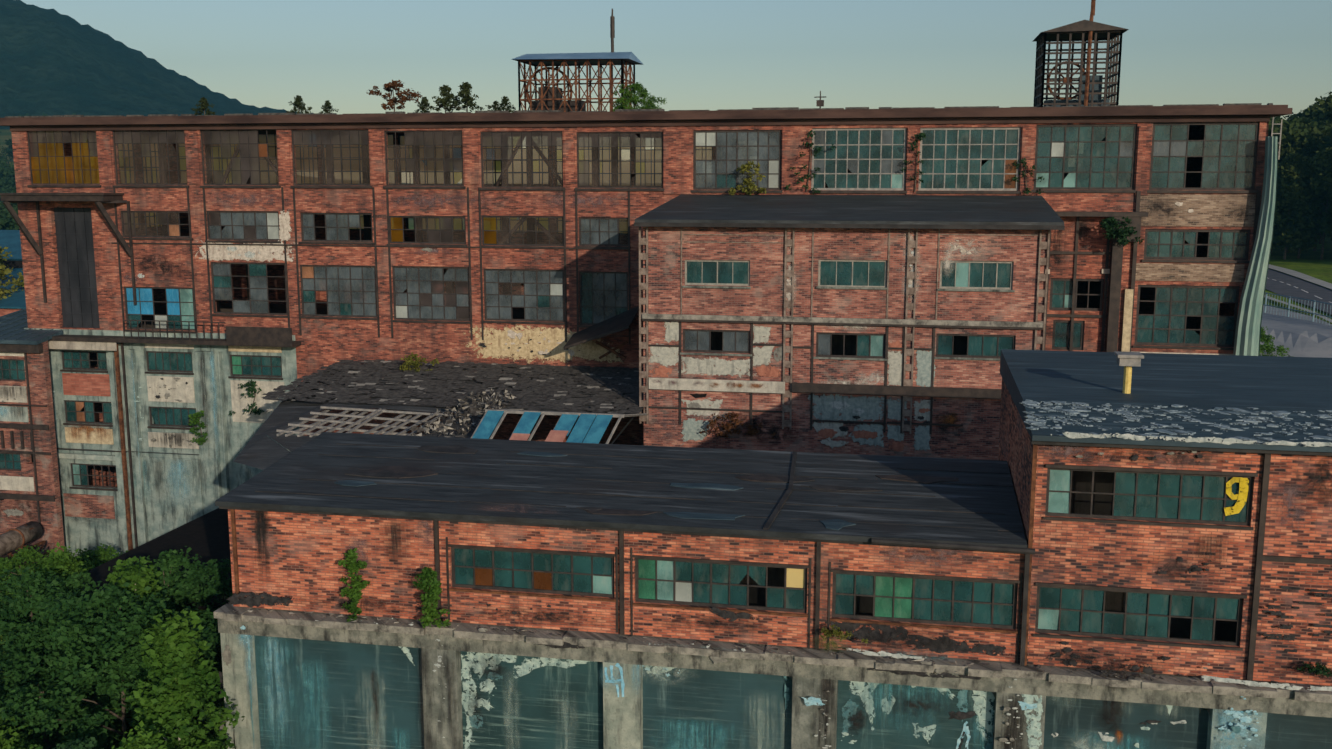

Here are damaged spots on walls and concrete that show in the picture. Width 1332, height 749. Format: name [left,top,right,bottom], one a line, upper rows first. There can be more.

flaking render [464,325,622,364]
peeling [649,321,783,378]
flaking render [681,397,723,442]
flaking render [807,340,936,451]
peeling [1020,399,1332,463]
peeling [398,604,590,749]
peeling [642,665,680,677]
spalling [783,619,1058,749]